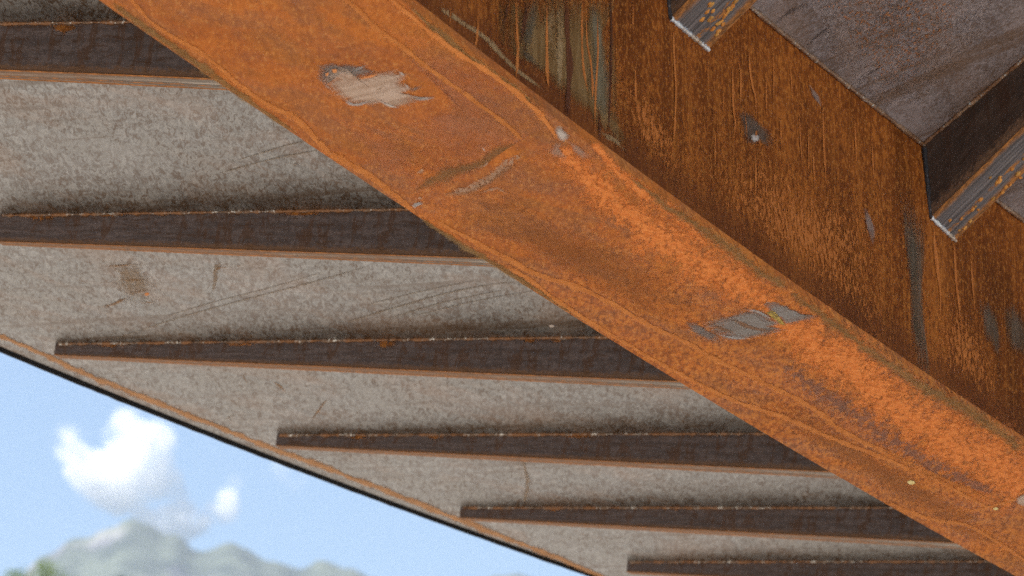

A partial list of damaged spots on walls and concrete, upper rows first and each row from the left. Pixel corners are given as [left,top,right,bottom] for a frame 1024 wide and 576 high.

rust [130,0,414,212]
peeling [321,65,428,107]
rust [344,0,557,139]
rust [565,3,599,117]
rust [622,33,678,171]
rust [699,0,739,37]
rust [723,55,775,131]
rust [436,117,1024,561]
peeling [633,180,1018,450]
rust [0,335,603,576]